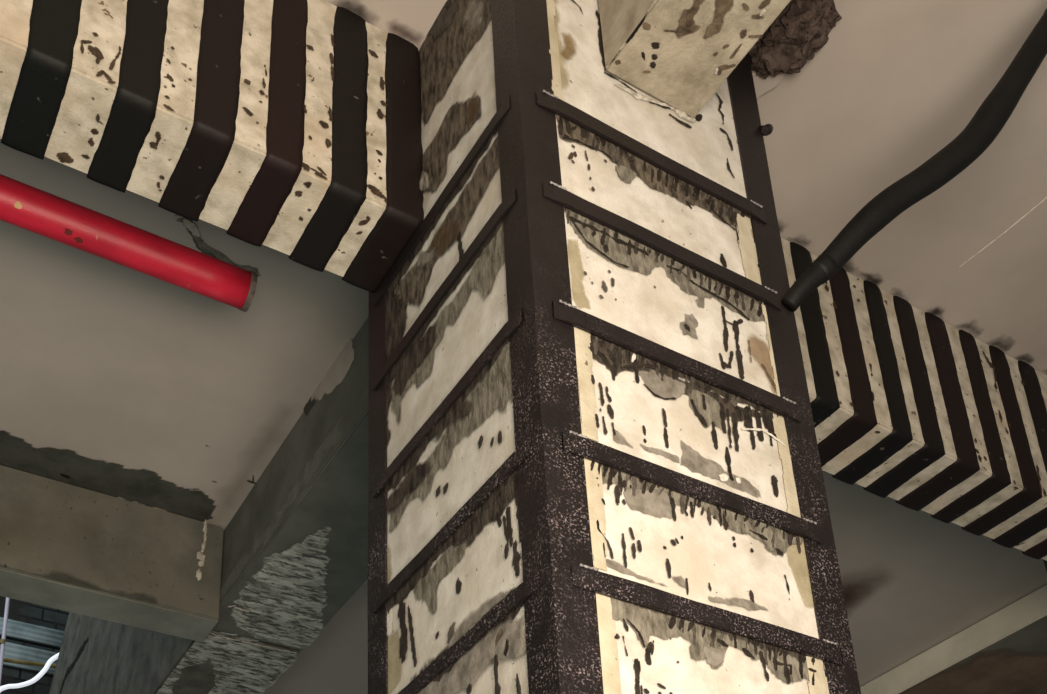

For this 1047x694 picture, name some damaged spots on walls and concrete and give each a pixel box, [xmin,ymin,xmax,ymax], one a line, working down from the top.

spalling [641,0,842,99]
peeling [556,114,751,231]
peeling [564,207,765,322]
peeling [0,431,216,522]
peeling [386,338,513,532]
peeling [588,333,786,452]
peeling [591,460,804,556]
peeling [602,594,825,685]